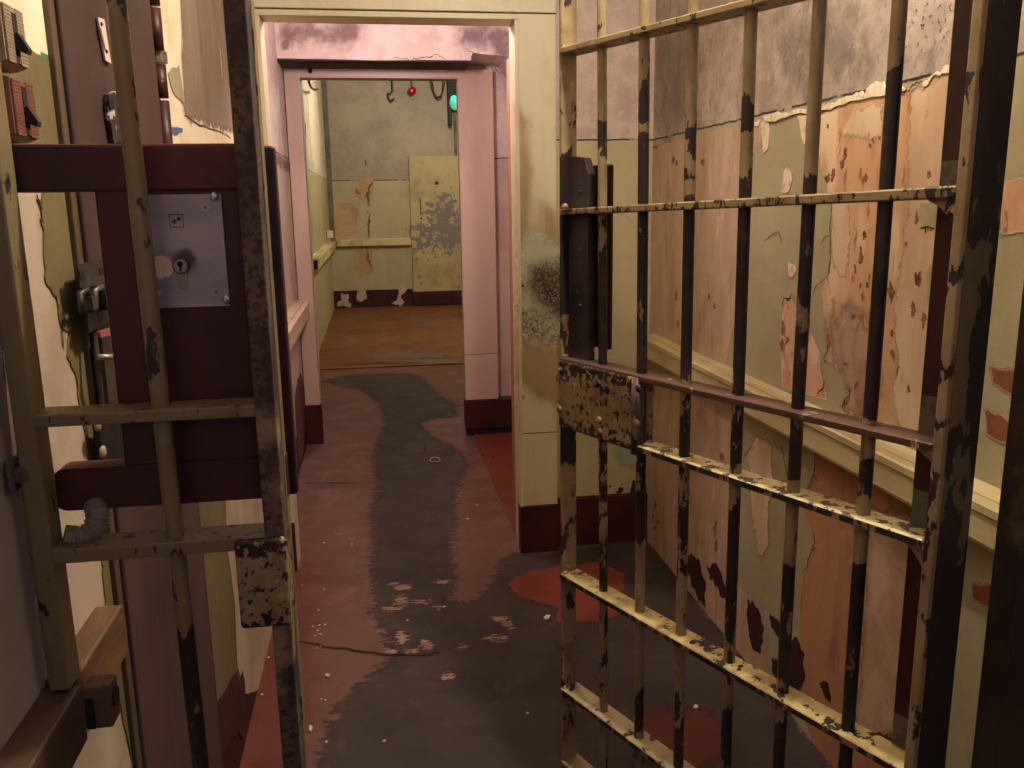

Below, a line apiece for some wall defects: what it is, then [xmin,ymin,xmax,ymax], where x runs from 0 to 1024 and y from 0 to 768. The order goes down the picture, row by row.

peeling [158,0,234,144]
peeling [18,193,81,407]
water stain [521,233,560,346]
peeling [649,125,741,365]
peeling [806,81,886,418]
peeling [877,65,949,431]
peeling [48,425,94,474]
peeling [59,508,86,537]
peeling [66,561,107,636]
peeling [314,373,561,768]
peeling [800,509,855,714]
peeling [73,674,132,768]